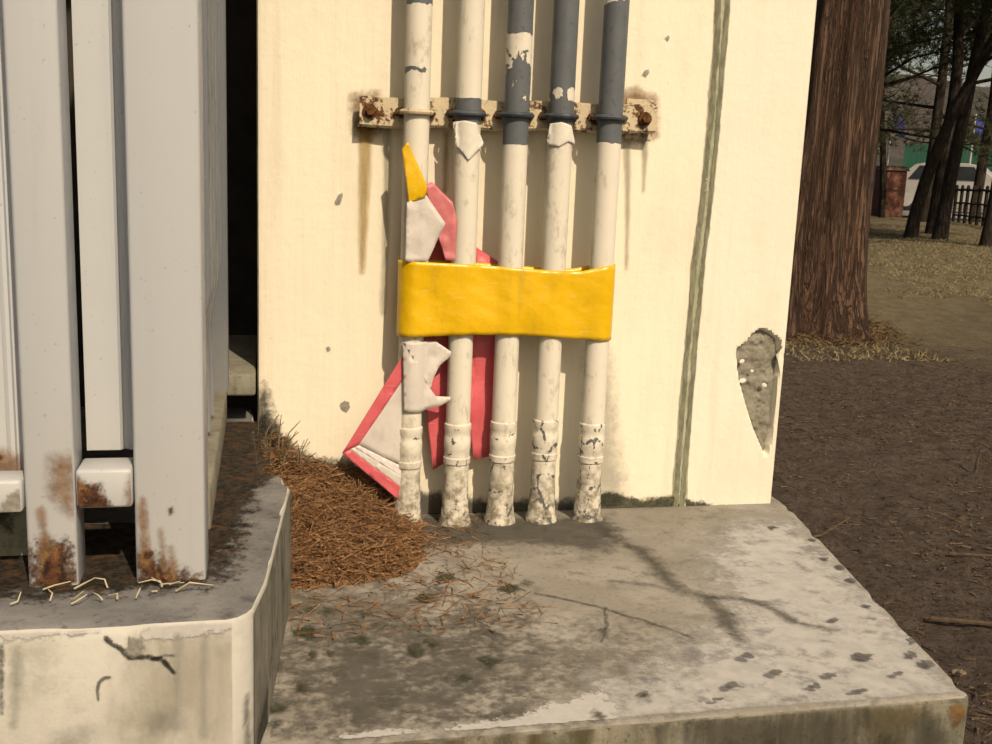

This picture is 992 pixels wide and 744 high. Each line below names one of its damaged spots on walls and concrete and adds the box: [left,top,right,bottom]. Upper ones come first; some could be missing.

rust [354,96,380,269]
spalling [736,330,777,451]
rust [52,459,112,508]
rust [28,509,77,587]
rust [129,489,200,583]
leakage [245,491,293,744]
crack [536,593,693,641]
crack [104,636,176,674]
crack [96,676,111,701]
leakage [530,733,542,744]
leakage [576,729,592,744]
leakage [684,708,926,744]